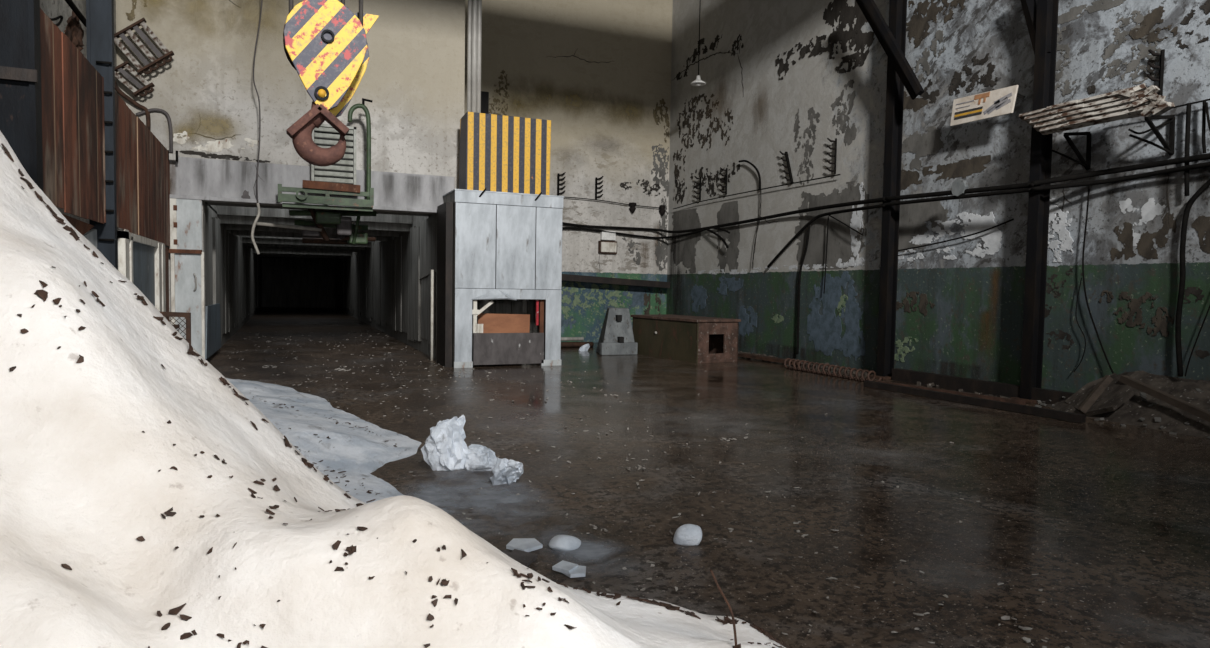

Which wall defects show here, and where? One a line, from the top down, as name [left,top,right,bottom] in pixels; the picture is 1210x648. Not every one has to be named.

peeling [903,0,998,112]
peeling [1055,0,1210,96]
spalling [620,0,875,361]
spalling [898,126,1002,262]
spalling [1110,198,1177,261]
spalling [1192,215,1210,254]